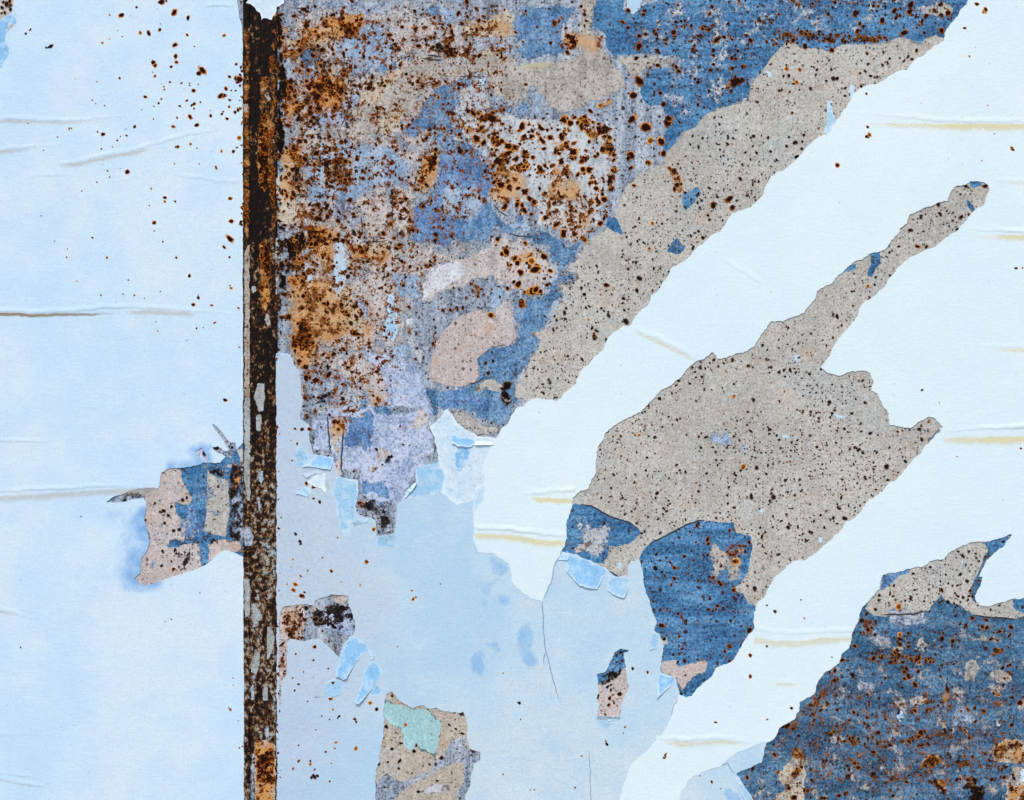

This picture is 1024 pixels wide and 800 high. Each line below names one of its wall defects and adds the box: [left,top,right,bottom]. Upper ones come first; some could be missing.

rust [141,0,953,447]
peeling [261,0,968,547]
peeling [109,424,253,586]
peeling [558,181,989,698]
peeling [250,594,480,800]
peeling [736,534,1024,800]
rust [745,547,1024,800]